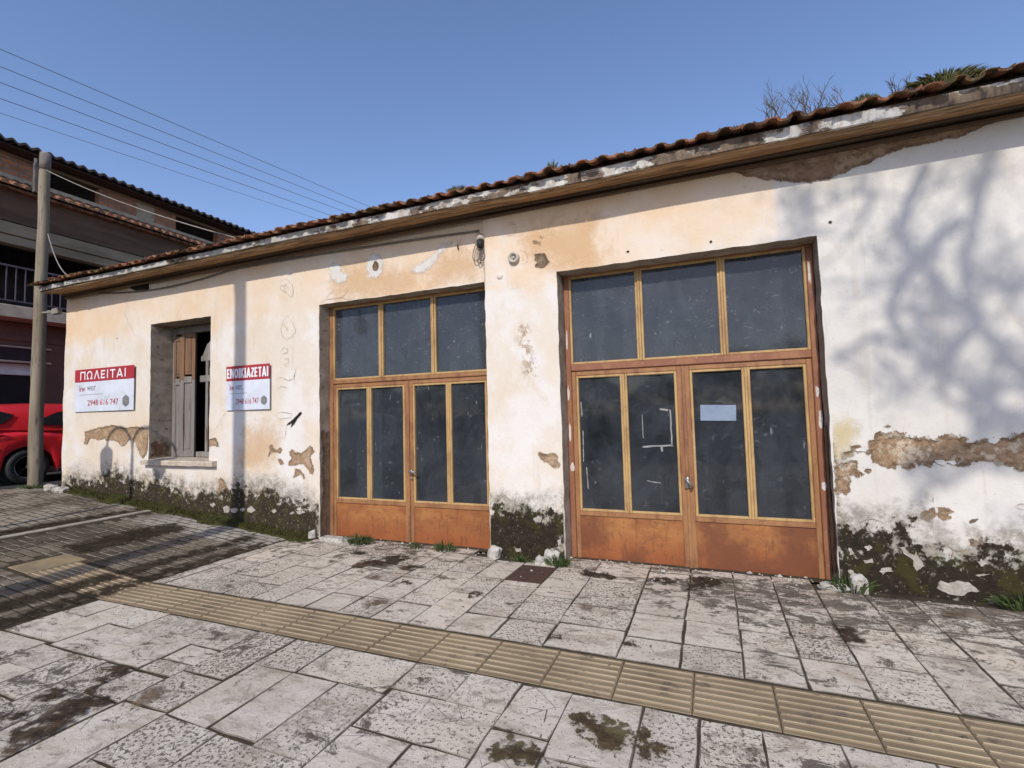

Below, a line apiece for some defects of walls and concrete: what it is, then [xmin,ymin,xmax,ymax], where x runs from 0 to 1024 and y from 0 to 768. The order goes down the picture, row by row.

flaking render [533,236,549,268]
flaking render [83,425,148,458]
water stain [62,463,319,539]
flaking render [268,429,329,537]
water stain [490,493,565,561]
flaking render [538,452,575,471]
flaking render [819,410,1024,573]
water stain [836,497,1024,605]